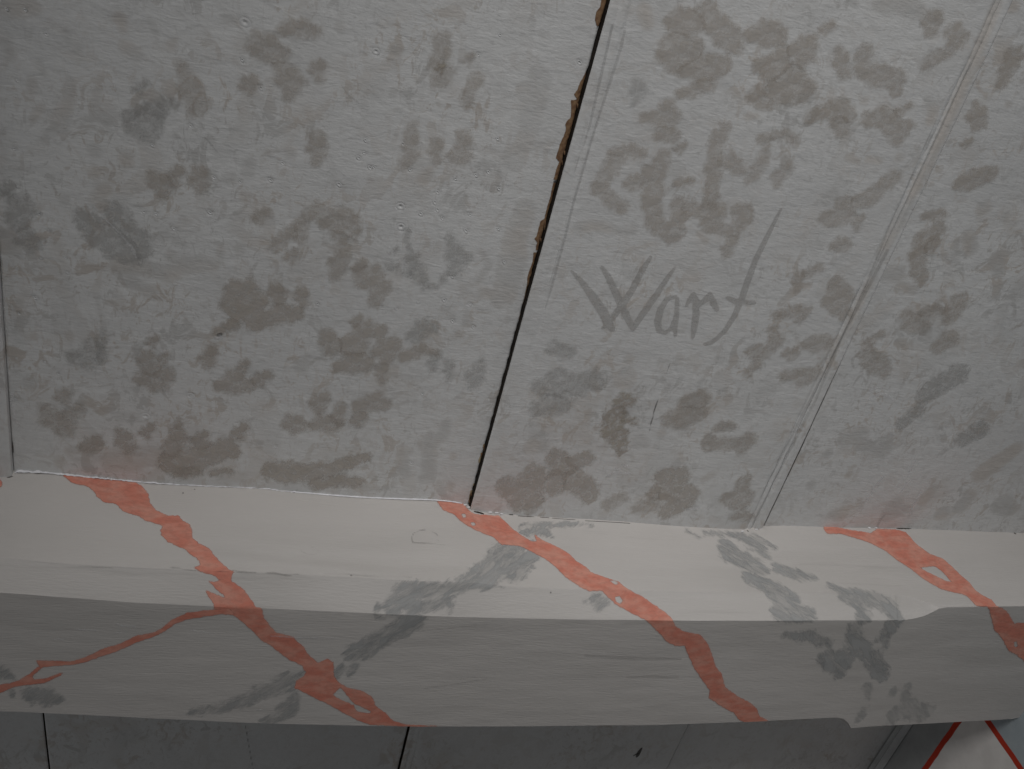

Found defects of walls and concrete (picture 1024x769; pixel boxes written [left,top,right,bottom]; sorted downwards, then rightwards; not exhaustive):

damp [199,279,308,366]
damp [262,454,370,489]